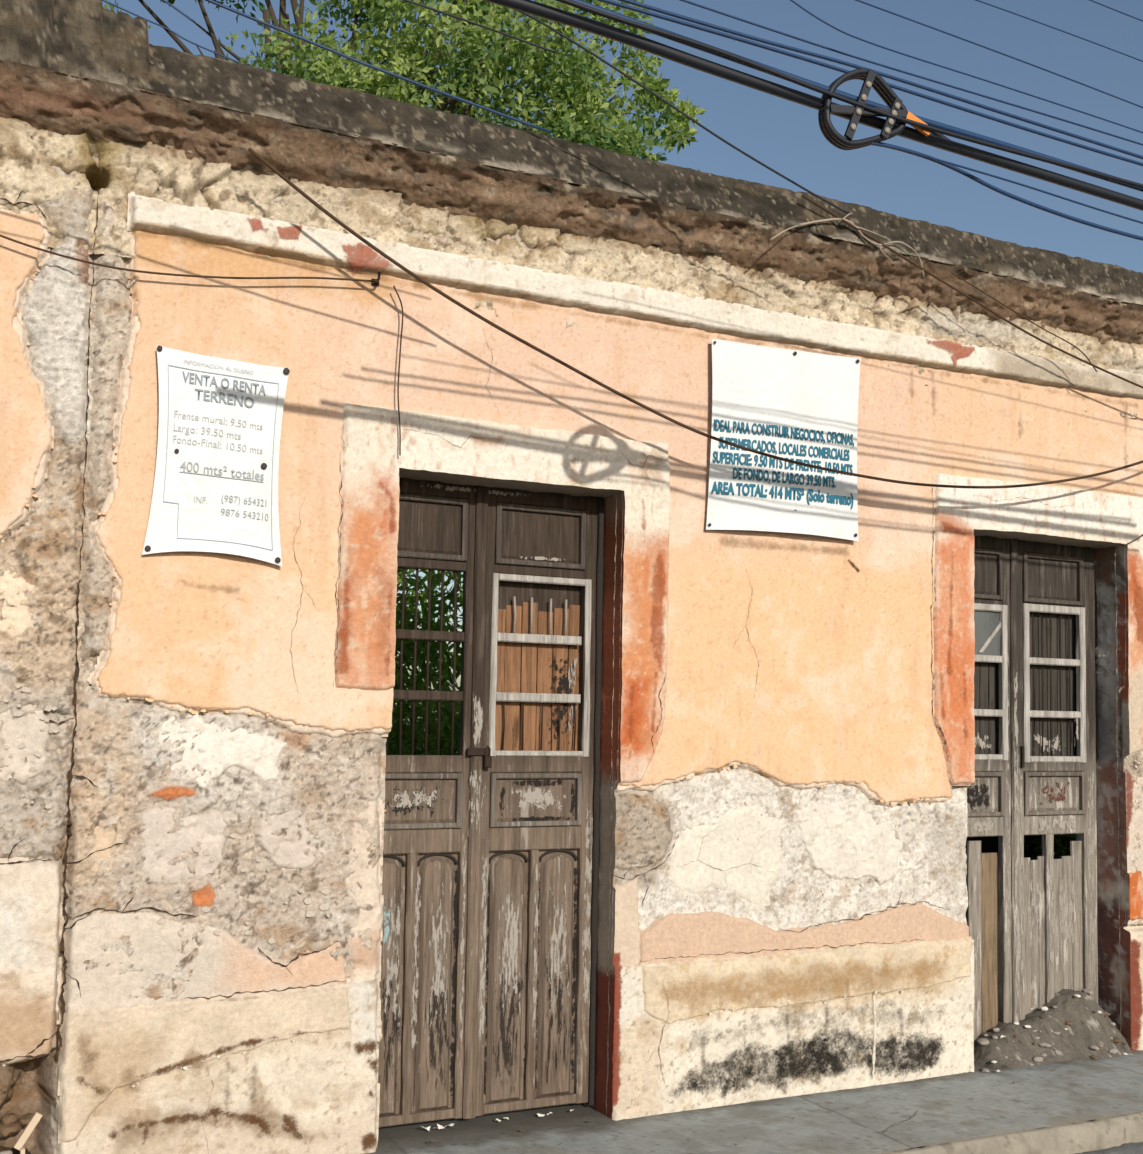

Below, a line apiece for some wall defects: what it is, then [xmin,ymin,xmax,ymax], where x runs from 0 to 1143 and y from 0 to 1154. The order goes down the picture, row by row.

spalling [0,117,1143,1000]
peeling [378,889,403,1091]
peeling [411,770,487,1096]
peeling [479,779,593,1095]
peeling [607,951,622,1105]
water stain [676,990,943,1096]
peeling [1130,940,1143,1051]